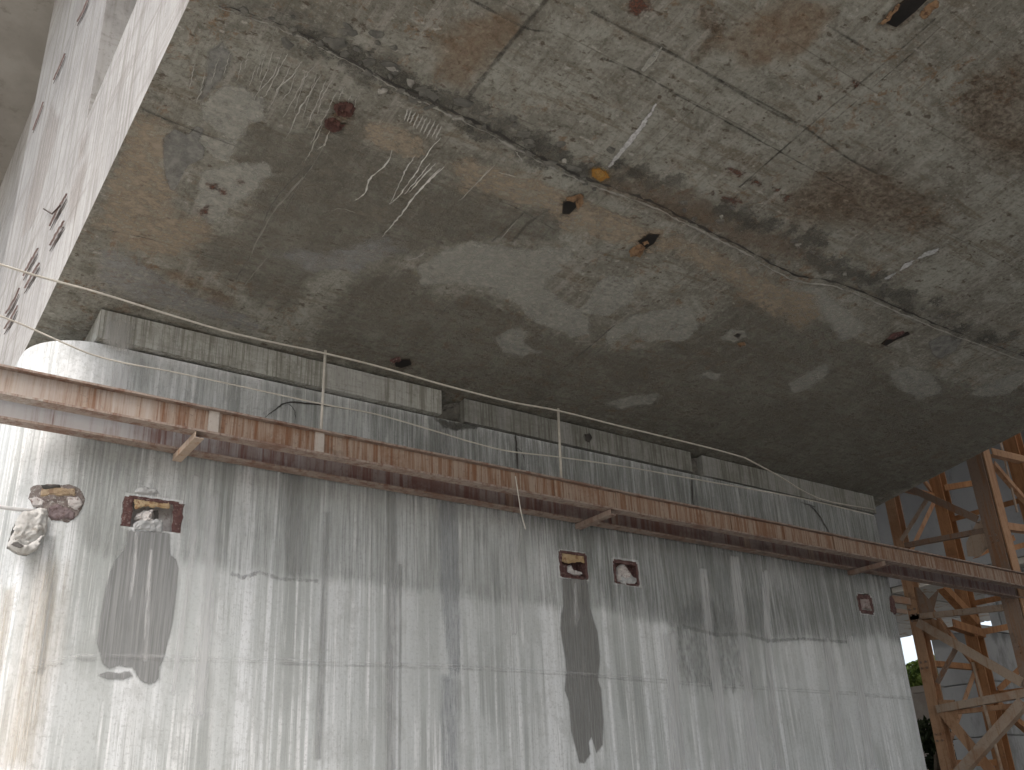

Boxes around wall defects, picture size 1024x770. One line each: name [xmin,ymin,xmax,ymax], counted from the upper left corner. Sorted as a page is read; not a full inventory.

spalling [878,0,939,27]
leakage [189,42,359,288]
rust [324,102,355,133]
leakage [382,109,444,237]
spalling [465,115,685,214]
crack [219,6,1024,357]
spalling [629,233,660,258]
leakage [97,531,188,684]
leakage [561,578,603,763]